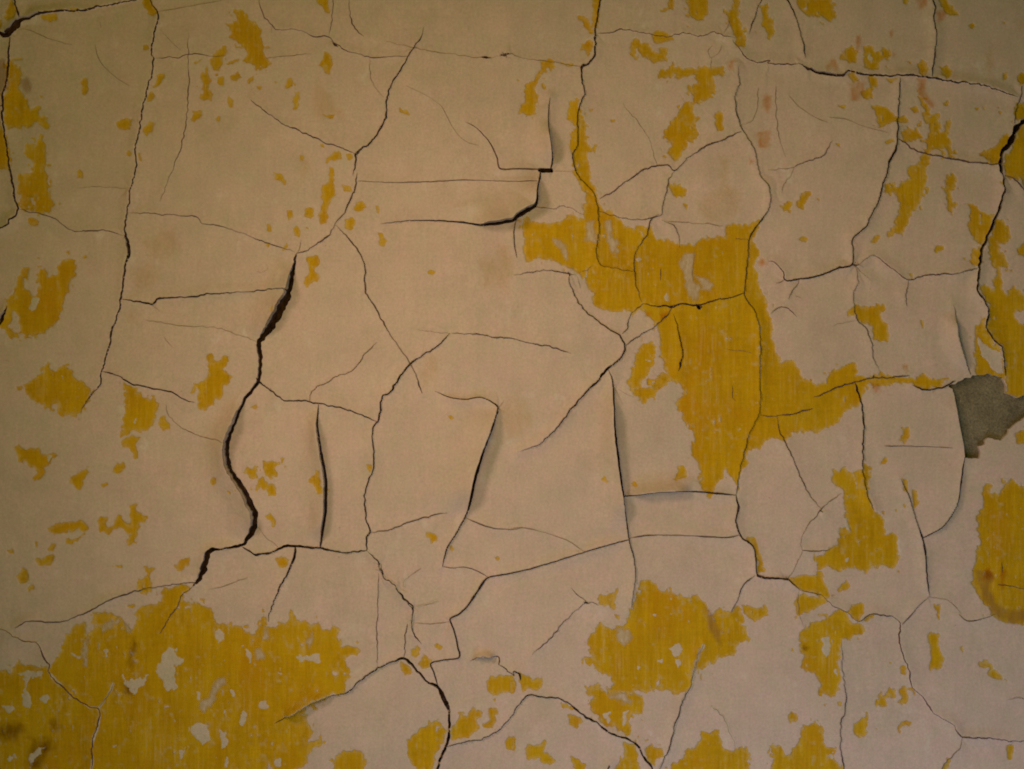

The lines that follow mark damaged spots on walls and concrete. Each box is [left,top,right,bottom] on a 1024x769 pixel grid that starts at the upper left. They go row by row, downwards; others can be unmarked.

peeling [0,58,60,226]
peeling [190,9,272,122]
peeling [0,251,87,342]
peeling [15,362,95,420]
crack [0,0,771,769]
peeling [438,30,1024,706]
crack [610,0,1024,510]
peeling [0,558,360,769]
peeling [329,747,367,769]
peeling [407,672,543,769]
peeling [560,580,769,769]
crack [675,387,1022,769]